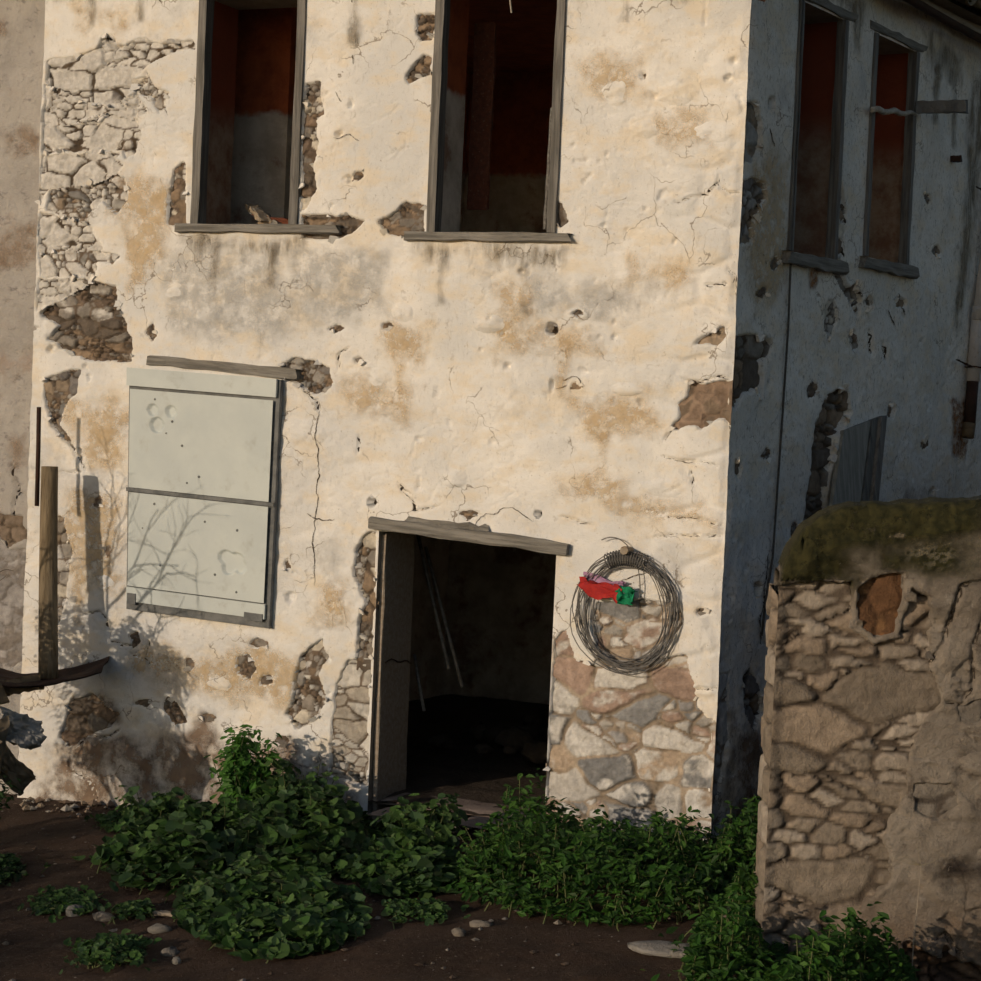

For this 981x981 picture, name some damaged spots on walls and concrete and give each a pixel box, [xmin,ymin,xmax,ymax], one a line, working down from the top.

spalling [34,33,195,449]
spalling [298,81,364,244]
spalling [739,177,764,244]
spalling [744,101,763,163]
damp [956,82,981,325]
spalling [664,327,770,432]
spalling [791,381,850,536]
spalling [288,532,379,786]
spalling [543,598,728,843]
spalling [742,573,958,954]
crack [929,580,979,673]
crack [947,667,975,705]